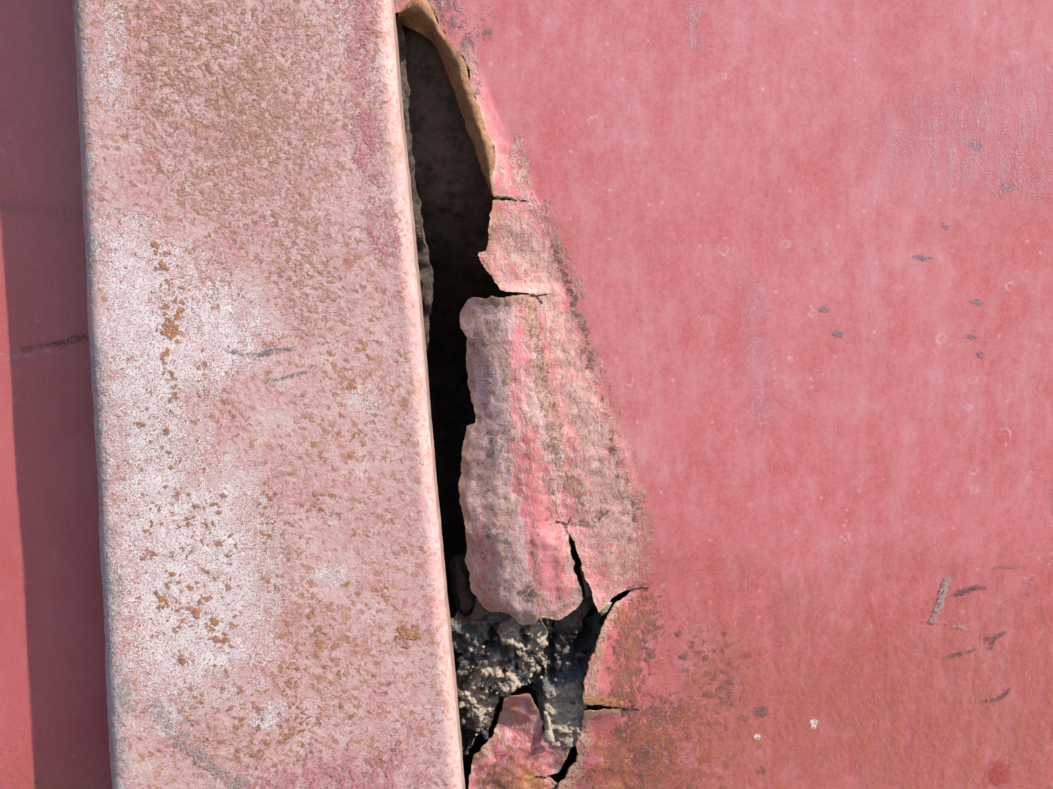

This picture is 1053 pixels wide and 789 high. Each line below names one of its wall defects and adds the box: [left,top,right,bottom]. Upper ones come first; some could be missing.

rust [93,0,400,472]
peeling [488,130,657,602]
rust [133,484,242,665]
rust [152,461,359,789]
rust [335,578,392,603]
rust [394,621,422,649]
rust [461,198,779,789]
peeling [475,705,536,760]
peeling [553,710,620,789]